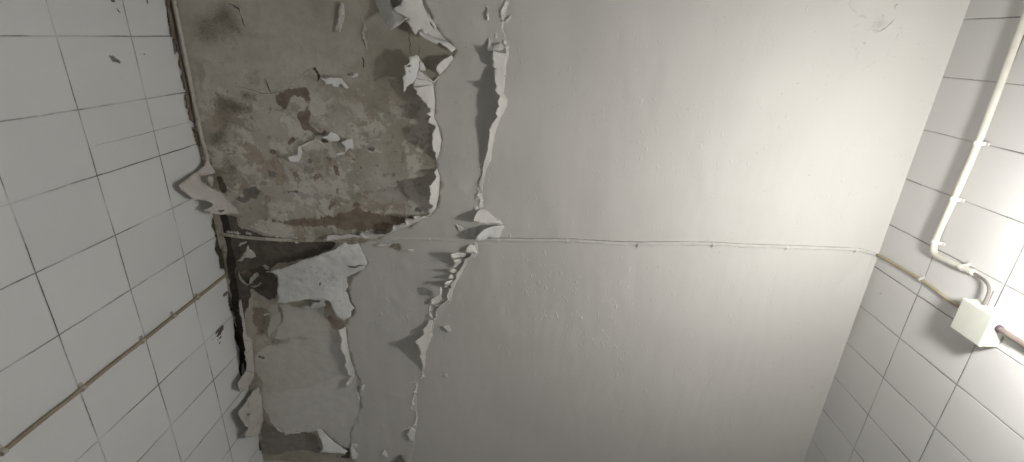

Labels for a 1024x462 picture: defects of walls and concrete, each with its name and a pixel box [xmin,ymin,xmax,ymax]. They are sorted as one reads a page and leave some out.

damp [269,87,326,155]
flaking render [166,0,511,462]